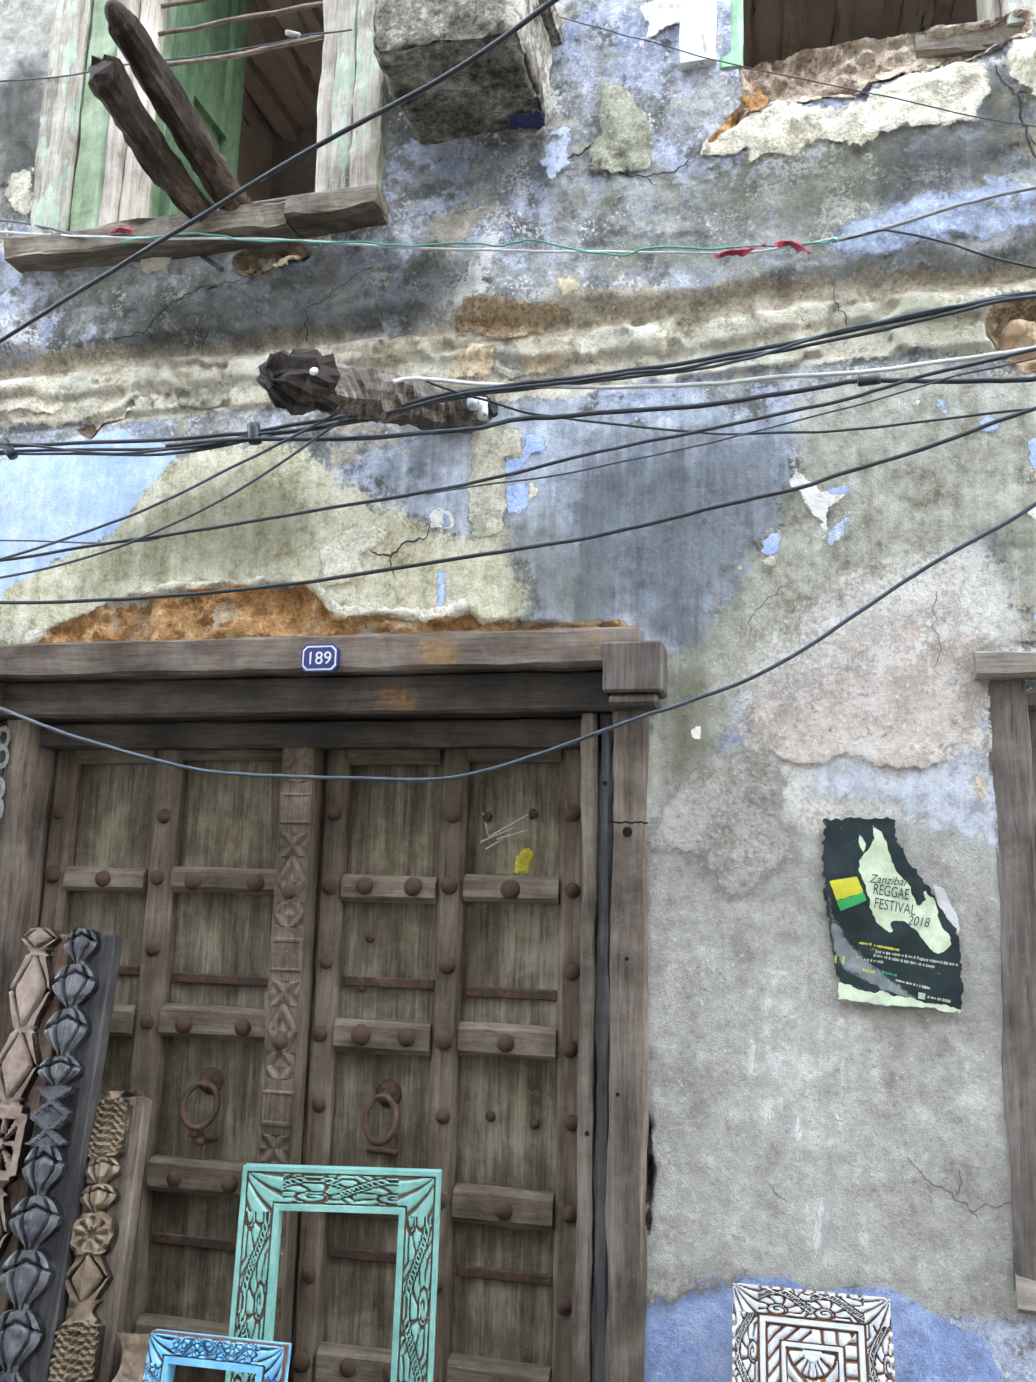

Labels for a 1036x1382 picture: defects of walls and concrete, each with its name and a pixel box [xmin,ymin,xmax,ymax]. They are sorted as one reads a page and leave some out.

peeling [508,111,571,179]
flaking render [589,81,655,174]
flaking render [700,7,1035,163]
crack [995,65,1036,159]
flaking render [986,290,1036,372]
flaking render [0,384,66,414]
flaking render [77,404,135,439]
flaking render [429,424,547,539]
peeling [789,469,853,547]
peeling [1023,438,1036,483]
flaking render [0,523,629,646]
crack [908,1158,1012,1220]